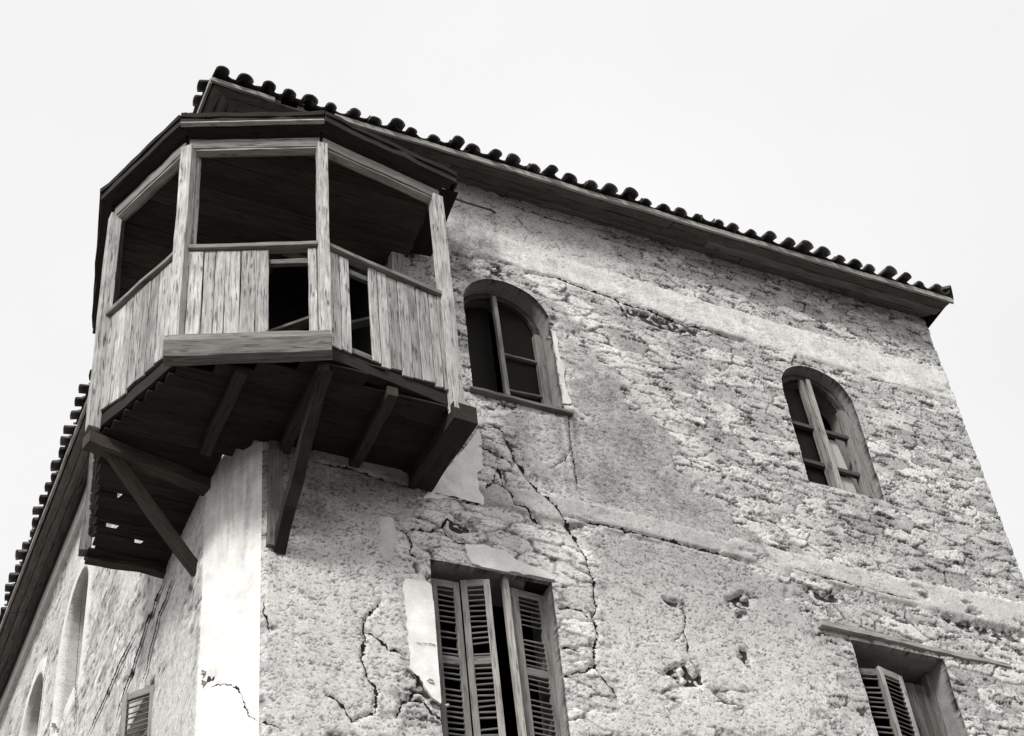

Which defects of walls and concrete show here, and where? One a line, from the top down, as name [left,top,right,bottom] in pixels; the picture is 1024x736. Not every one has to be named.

crack [315,461,409,488]
crack [395,418,737,702]
crack [327,602,442,723]
spalling [666,659,702,687]
crack [209,683,281,730]